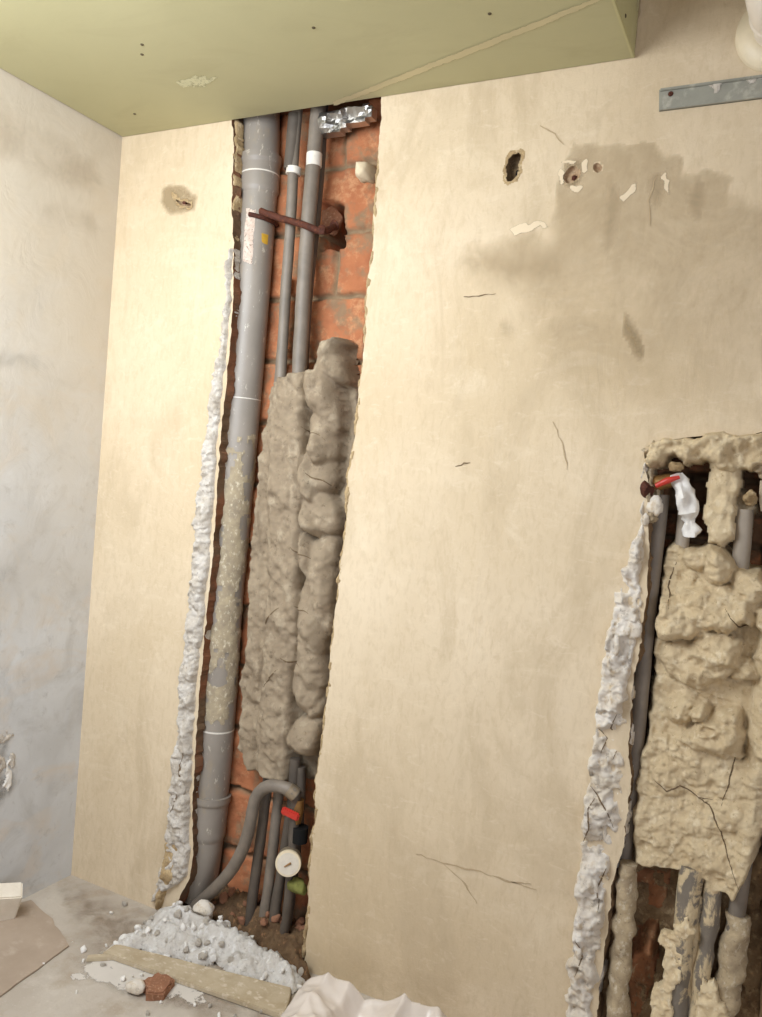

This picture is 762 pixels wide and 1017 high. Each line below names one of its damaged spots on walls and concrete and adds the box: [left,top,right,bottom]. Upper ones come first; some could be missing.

flaking render [503,148,525,186]
flaking render [558,159,602,193]
flaking render [0,730,15,792]
crack [416,854,536,903]